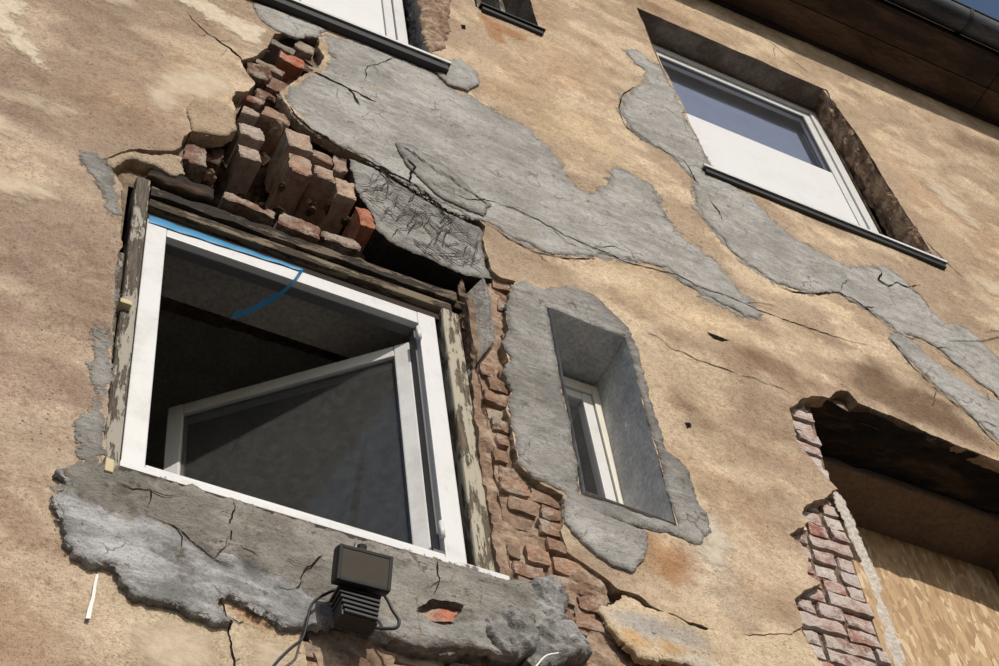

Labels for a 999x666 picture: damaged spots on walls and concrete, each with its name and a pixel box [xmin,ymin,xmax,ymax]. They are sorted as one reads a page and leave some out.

crack [186,10,242,59]
crack [304,57,398,104]
spalling [145,0,405,276]
spalling [120,187,132,253]
crack [285,84,999,440]
spalling [159,296,350,362]
flaking render [452,277,906,666]
crack [118,482,259,566]
crack [279,554,324,590]
crack [217,588,245,666]
flaking render [301,629,493,666]
spalling [417,599,463,622]